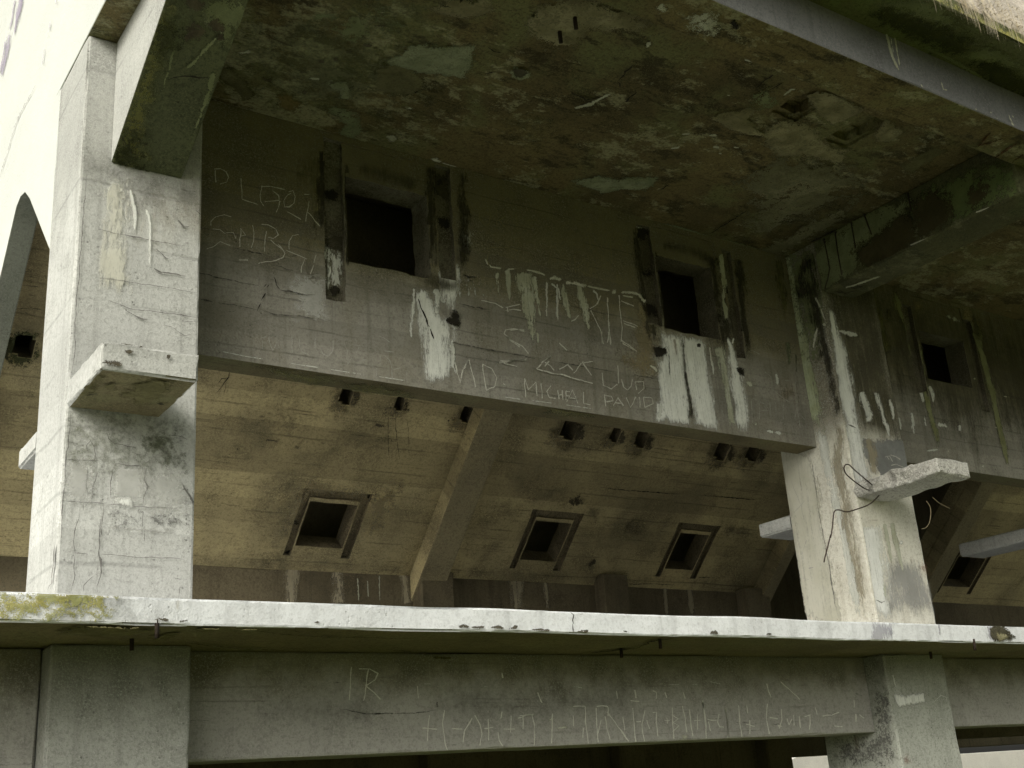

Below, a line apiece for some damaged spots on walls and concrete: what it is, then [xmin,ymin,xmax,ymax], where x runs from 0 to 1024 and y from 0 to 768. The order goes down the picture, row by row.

leakage [186,0,246,69]
leakage [870,0,1024,97]
spalling [709,75,865,164]
leakage [775,257,1024,639]
crack [48,417,180,592]
leakage [0,592,119,622]
spalling [989,626,1016,642]